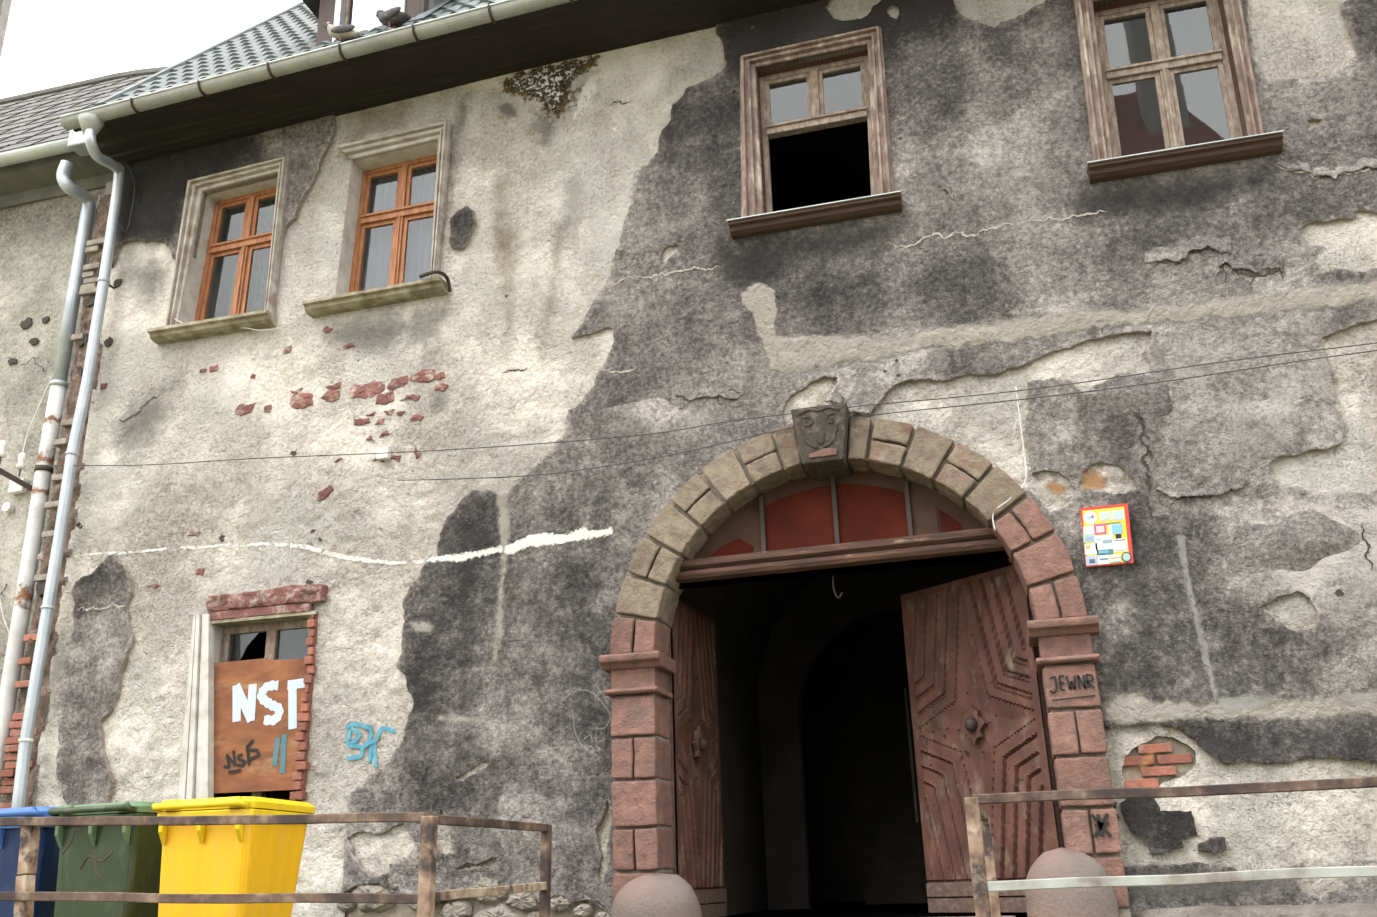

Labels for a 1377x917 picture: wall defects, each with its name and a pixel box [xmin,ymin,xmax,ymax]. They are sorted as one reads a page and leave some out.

peeling [827,0,899,21]
peeling [1247,0,1357,80]
crack [891,185,1107,248]
crack [1146,249,1284,284]
peeling [1300,212,1377,272]
crack [120,396,159,422]
peeling [0,27,726,917]
peeling [783,333,1251,516]
crack [1132,411,1212,514]
peeling [1268,321,1377,493]
crack [1361,525,1373,571]
peeling [1103,722,1377,896]